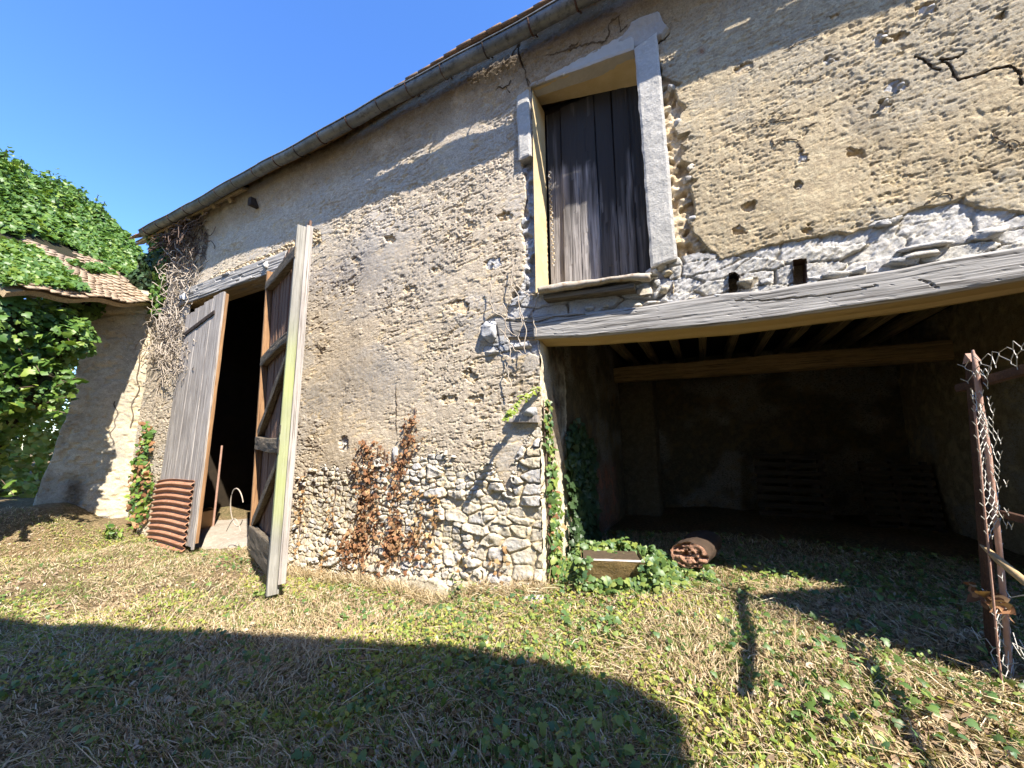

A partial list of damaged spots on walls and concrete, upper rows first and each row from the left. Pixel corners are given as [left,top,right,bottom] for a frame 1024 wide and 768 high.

crack [497,14,628,93]
crack [914,54,1024,86]
peeling [480,199,1024,359]